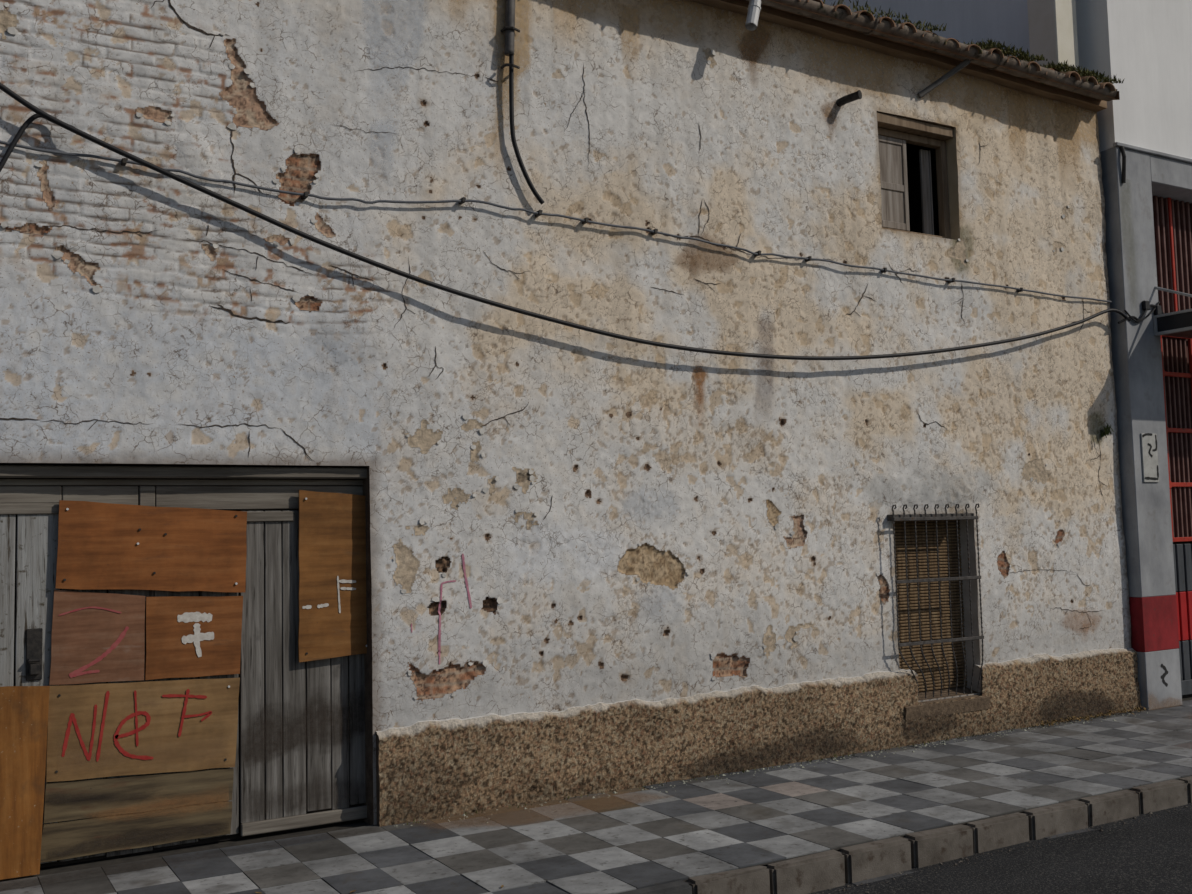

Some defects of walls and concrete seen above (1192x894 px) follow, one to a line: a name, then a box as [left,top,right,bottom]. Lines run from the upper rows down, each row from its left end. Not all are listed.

crack [151,0,229,47]
spalling [219,32,279,131]
crack [564,65,590,160]
spalling [273,148,321,206]
spalling [52,245,103,293]
spalling [292,292,322,312]
crack [0,417,153,430]
crack [182,423,312,460]
spalling [766,488,816,566]
spalling [618,543,705,590]
spalling [408,660,489,701]
spalling [710,651,750,681]